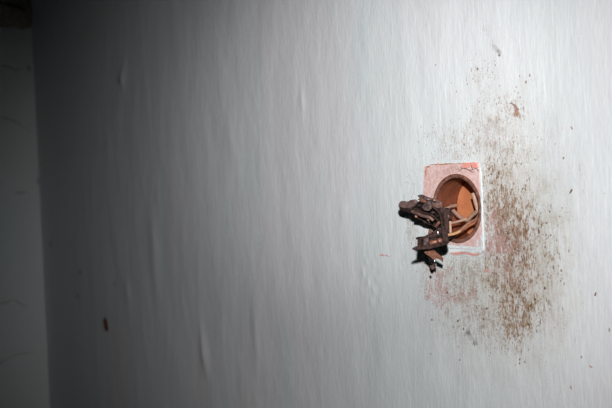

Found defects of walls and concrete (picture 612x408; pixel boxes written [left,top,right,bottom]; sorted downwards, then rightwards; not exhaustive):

flaking render [423,162,513,253]